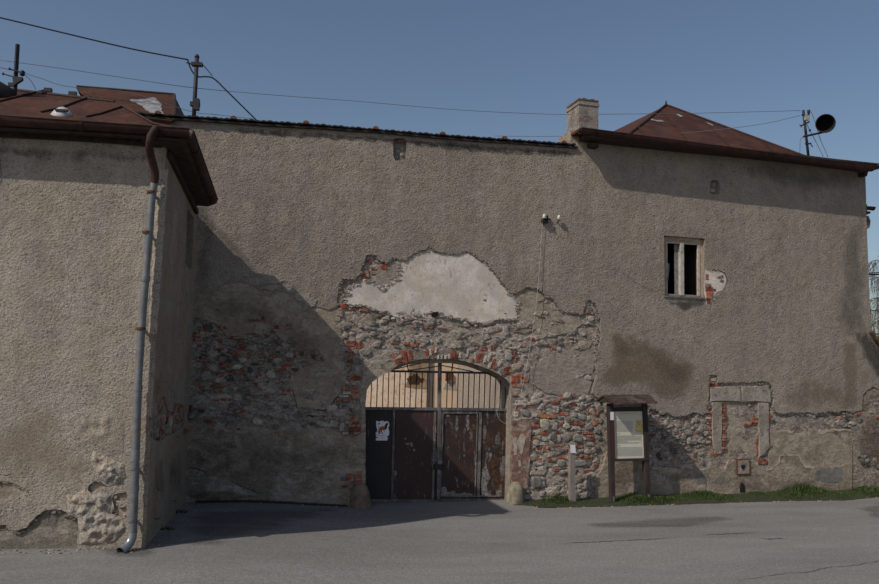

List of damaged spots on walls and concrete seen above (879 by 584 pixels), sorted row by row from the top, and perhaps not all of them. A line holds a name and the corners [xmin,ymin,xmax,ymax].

spalling [704,269,727,305]
spalling [145,245,621,500]
spalling [647,375,879,489]
spalling [0,481,29,499]
spalling [89,481,127,517]
spalling [0,509,78,549]